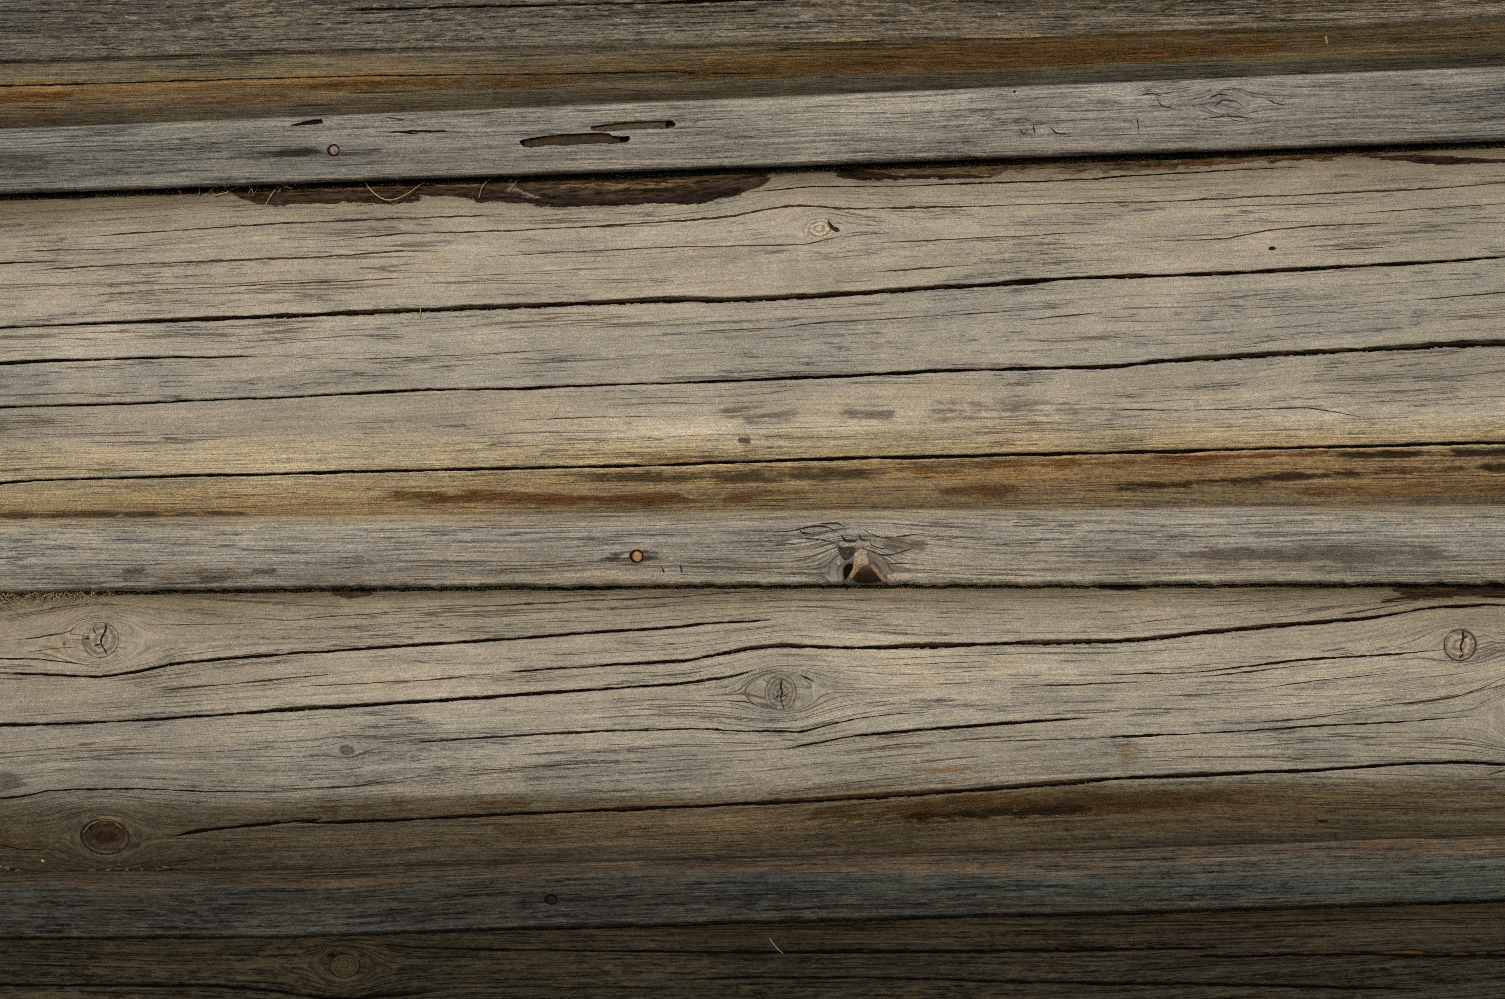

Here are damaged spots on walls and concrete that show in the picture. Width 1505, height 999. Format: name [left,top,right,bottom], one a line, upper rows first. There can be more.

crack [341,0,782,11]
crack [0,167,1505,420]
rust [605,551,658,563]
crack [0,564,1505,838]
crack [0,843,55,851]